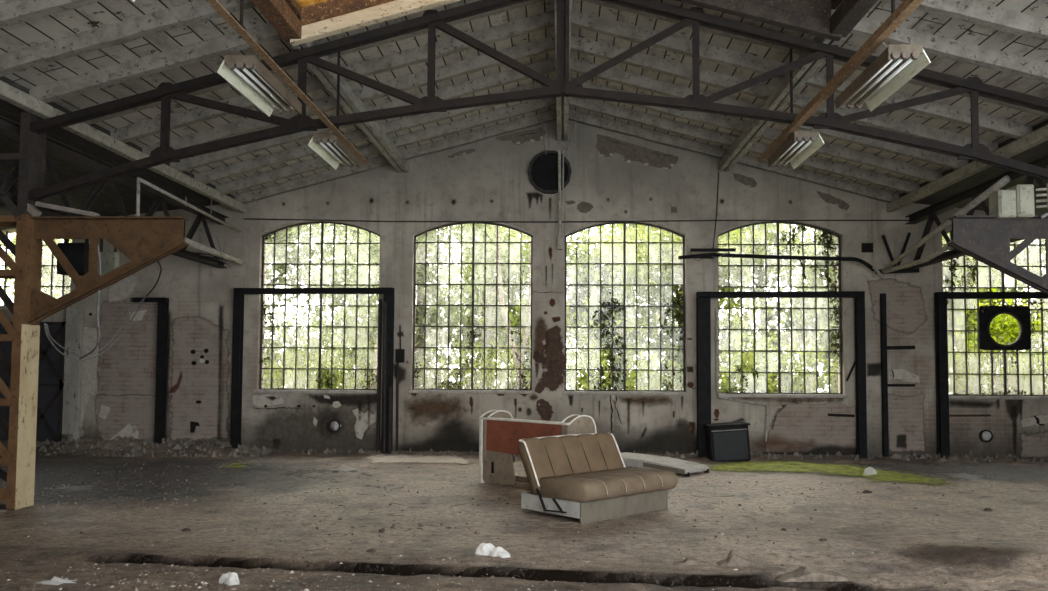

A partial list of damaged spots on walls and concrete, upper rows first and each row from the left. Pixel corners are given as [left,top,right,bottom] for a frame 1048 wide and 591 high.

leakage [527,193,551,212]
peeling [253,394,377,439]